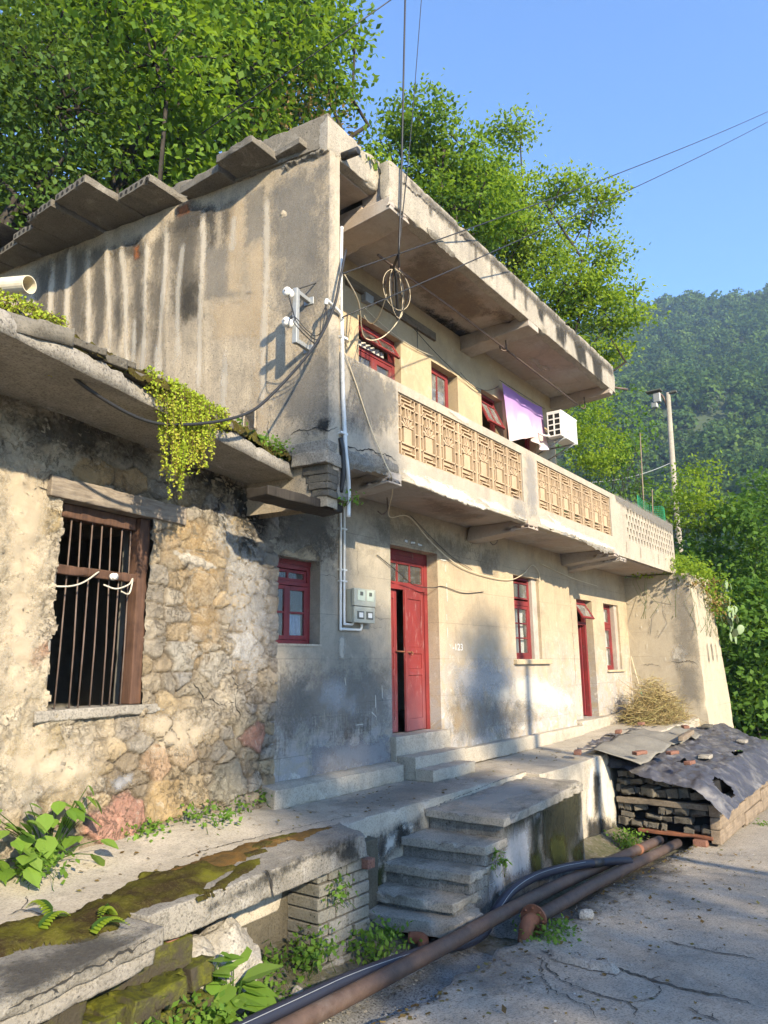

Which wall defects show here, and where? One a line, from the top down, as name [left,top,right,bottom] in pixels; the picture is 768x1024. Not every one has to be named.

damp [48,249,71,323]
damp [105,201,235,389]
damp [241,166,397,432]
crack [267,421,396,461]
spalling [173,550,217,571]
damp [234,839,359,896]
damp [0,935,134,992]
crack [539,949,751,1021]
crack [670,941,760,961]